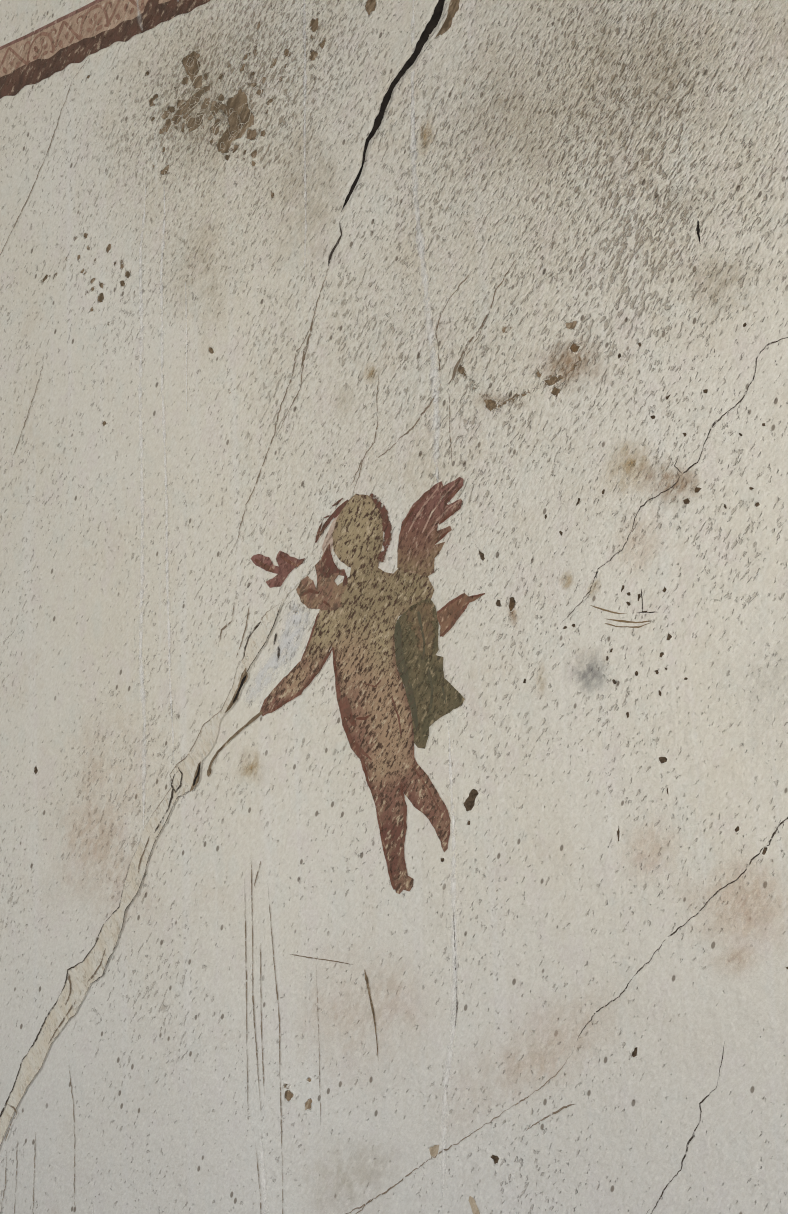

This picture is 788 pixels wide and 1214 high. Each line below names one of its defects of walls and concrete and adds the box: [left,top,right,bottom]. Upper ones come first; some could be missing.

crack [13,362,44,455]
crack [0,60,87,255]
spalling [148,3,327,176]
crack [235,0,462,555]
crack [351,254,520,492]
crack [562,337,788,622]
crack [0,565,314,1214]
crack [346,817,788,1214]